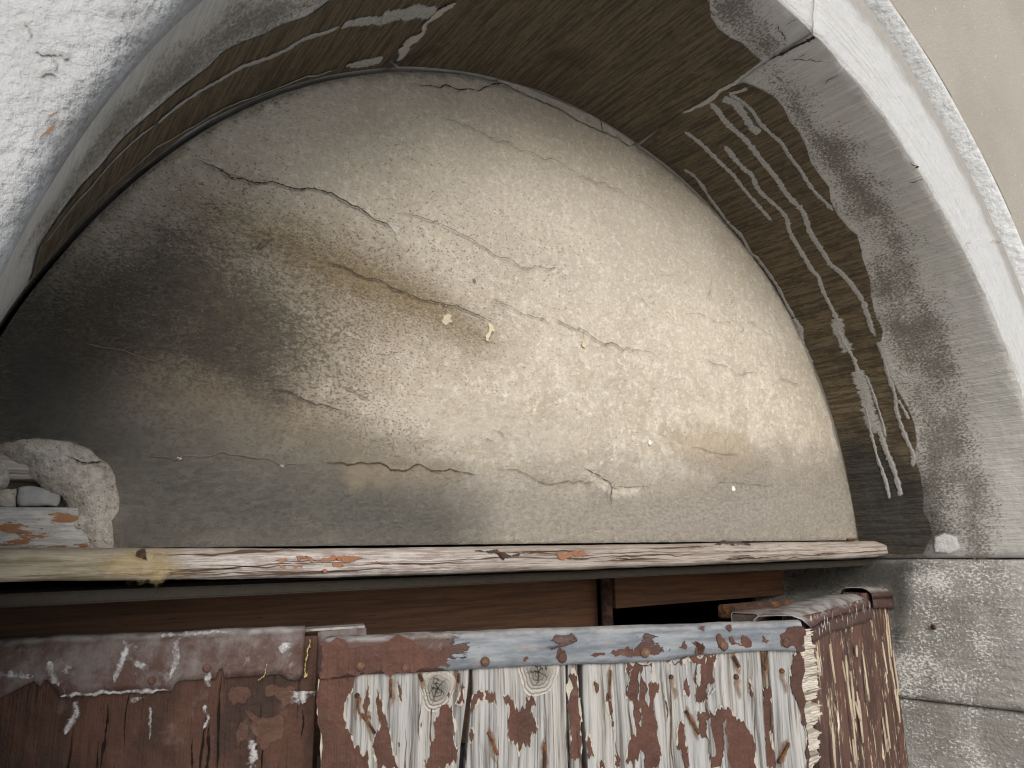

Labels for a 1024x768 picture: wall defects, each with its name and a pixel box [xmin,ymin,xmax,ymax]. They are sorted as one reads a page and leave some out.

crack [200,160,567,276]
crack [325,256,648,352]
leakage [17,0,1002,564]
crack [155,451,474,486]
crack [502,468,647,504]
peeling [316,634,451,768]
peeling [421,683,537,768]
peeling [566,624,810,768]